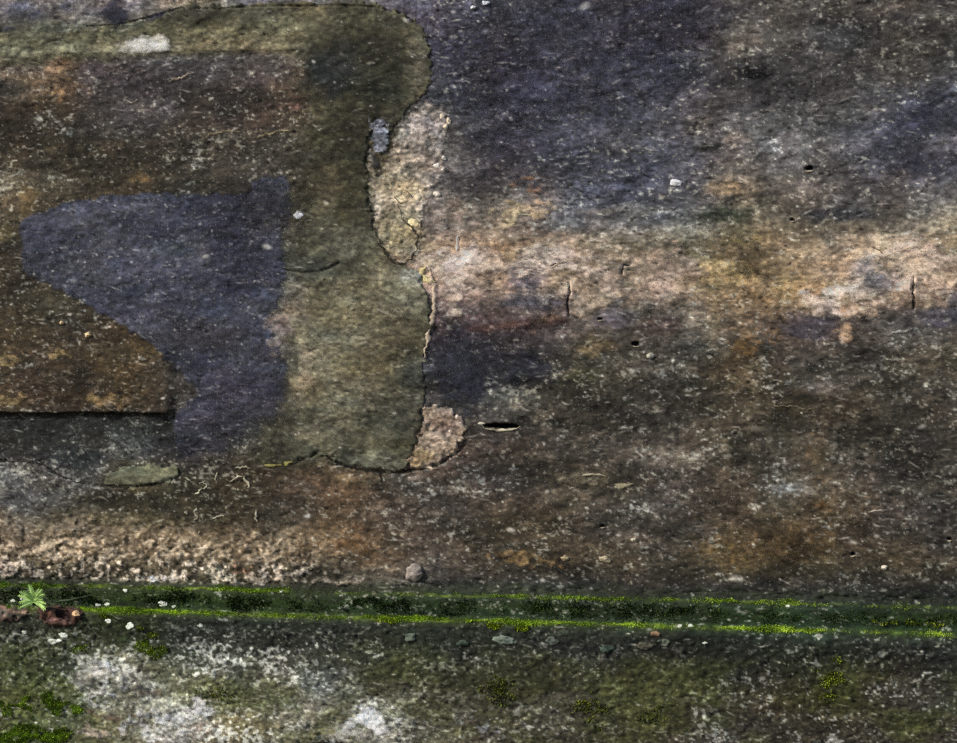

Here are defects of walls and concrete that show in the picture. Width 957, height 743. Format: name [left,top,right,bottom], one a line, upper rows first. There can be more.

damp [19,175,293,454]
crack [300,446,463,483]
spalling [367,103,451,357]
spalling [407,404,467,470]